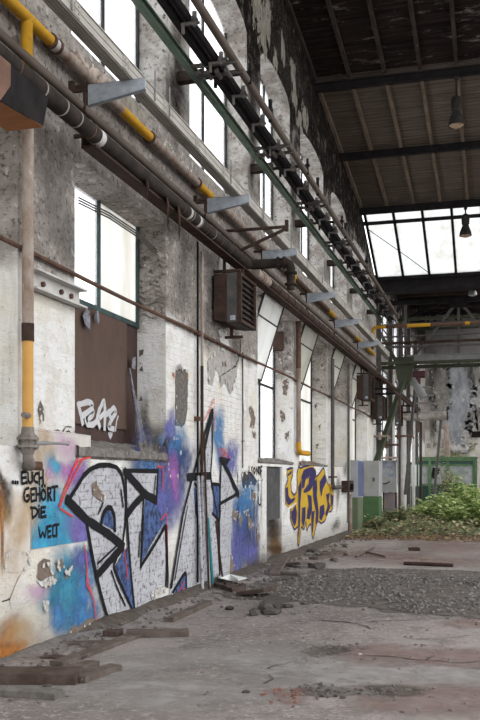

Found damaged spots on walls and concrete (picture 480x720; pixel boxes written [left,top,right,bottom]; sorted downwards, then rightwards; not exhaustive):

peeling [251,0,309,139]
peeling [208,328,240,394]
flaking render [175,369,189,428]
peeling [426,362,480,453]
peeling [92,481,106,502]
peeling [3,551,73,588]
corrosion [0,623,22,658]